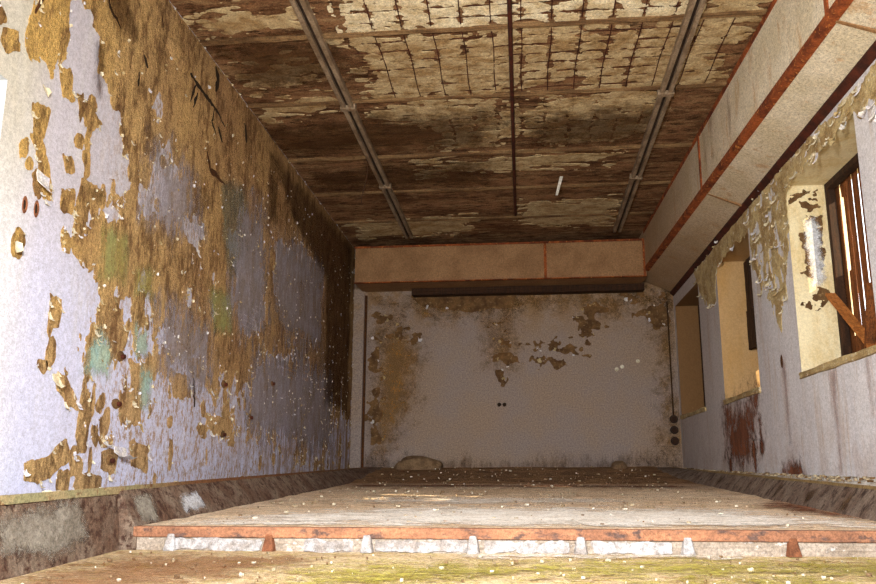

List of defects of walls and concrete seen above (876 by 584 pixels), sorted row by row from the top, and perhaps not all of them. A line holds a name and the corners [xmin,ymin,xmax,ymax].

spalling [325,0,689,152]
spalling [676,1,756,85]
leakage [521,109,652,146]
peeling [693,61,876,333]
peeling [0,0,355,560]
peeling [365,311,422,445]
peeling [411,295,609,387]
peeling [619,291,671,336]
rust [722,380,764,473]